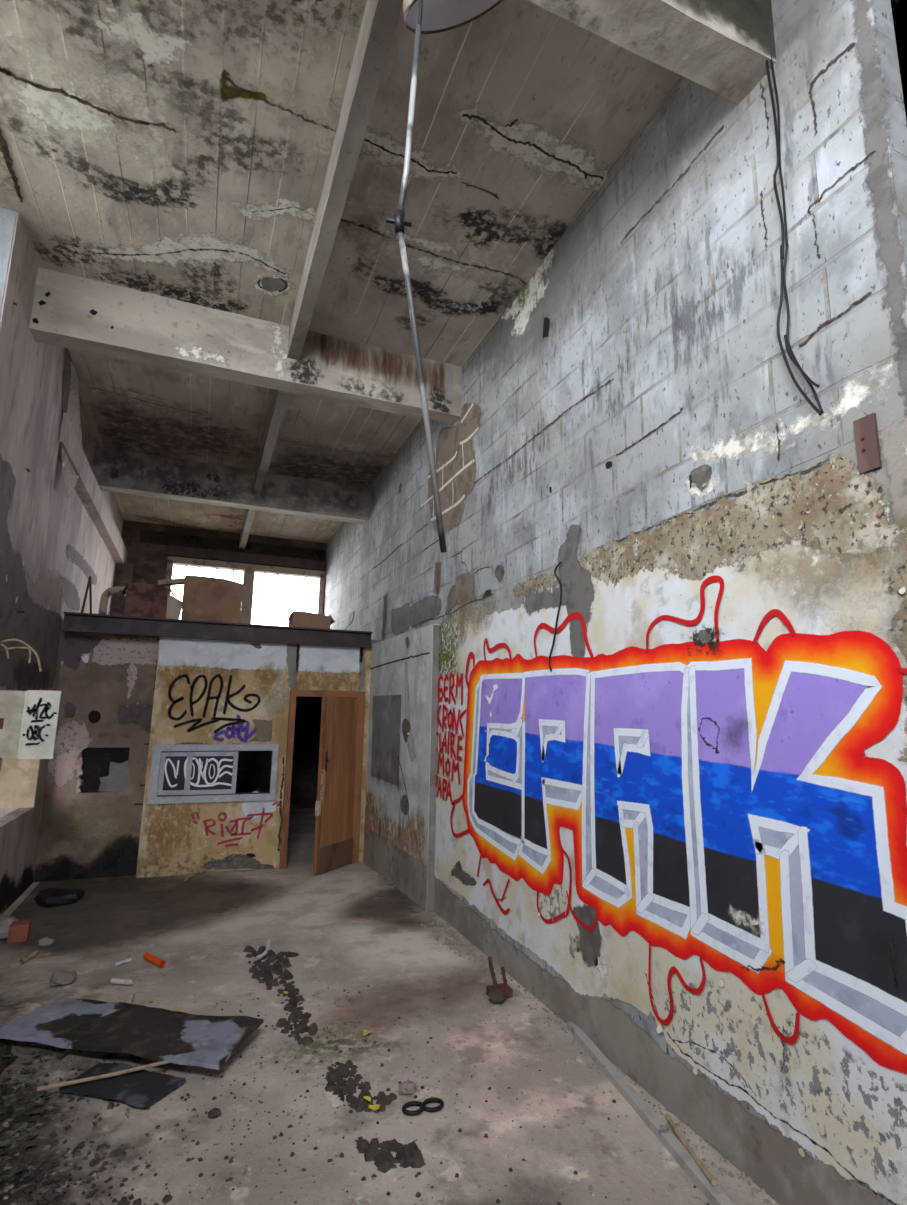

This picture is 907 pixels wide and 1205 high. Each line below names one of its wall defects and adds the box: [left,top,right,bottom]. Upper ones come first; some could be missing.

crack [0,130,23,202]
crack [0,68,176,133]
leakage [4,0,299,208]
crack [220,70,500,200]
crack [806,150,876,258]
leakage [34,237,247,312]
leakage [356,210,569,336]
leakage [93,402,383,513]
peeling [455,565,504,605]
flaking render [579,453,907,658]
flaking render [61,632,102,671]
flaking render [117,702,153,733]